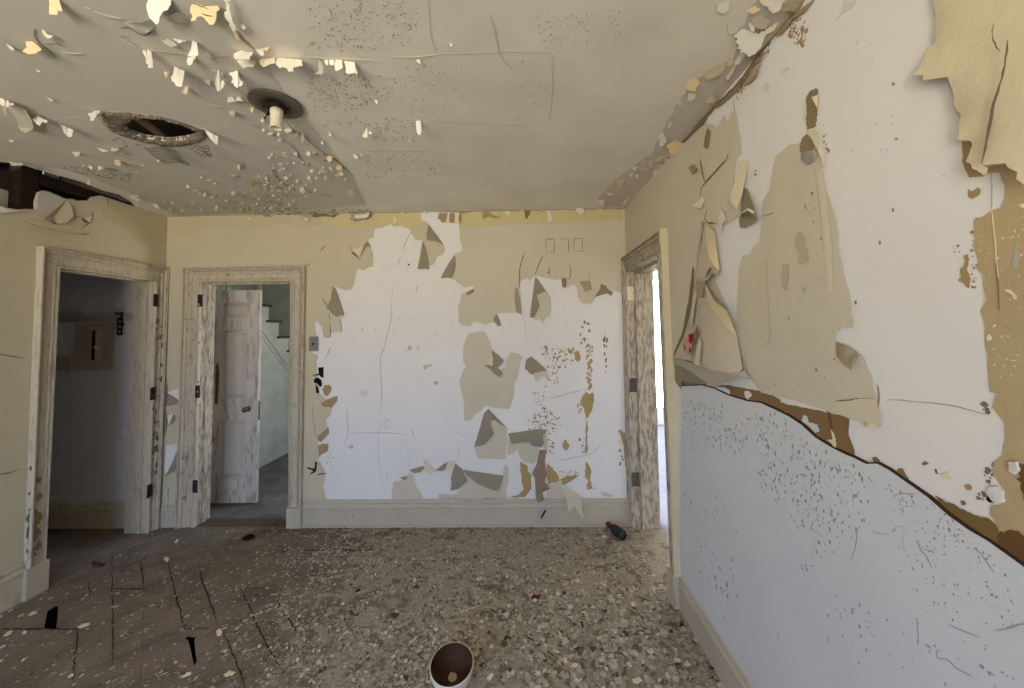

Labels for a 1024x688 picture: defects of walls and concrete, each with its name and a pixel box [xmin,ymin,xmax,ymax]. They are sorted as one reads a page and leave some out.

flaking render [72,110,218,185]
peeling [142,0,198,94]
peeling [190,3,220,25]
peeling [205,23,357,220]
flaking render [597,0,801,211]
spalling [799,88,825,166]
crack [344,292,415,492]
flaking render [546,392,594,489]
mould [681,399,872,574]
flaking render [681,141,1024,567]
mould [885,485,1014,628]
leakage [976,462,994,501]